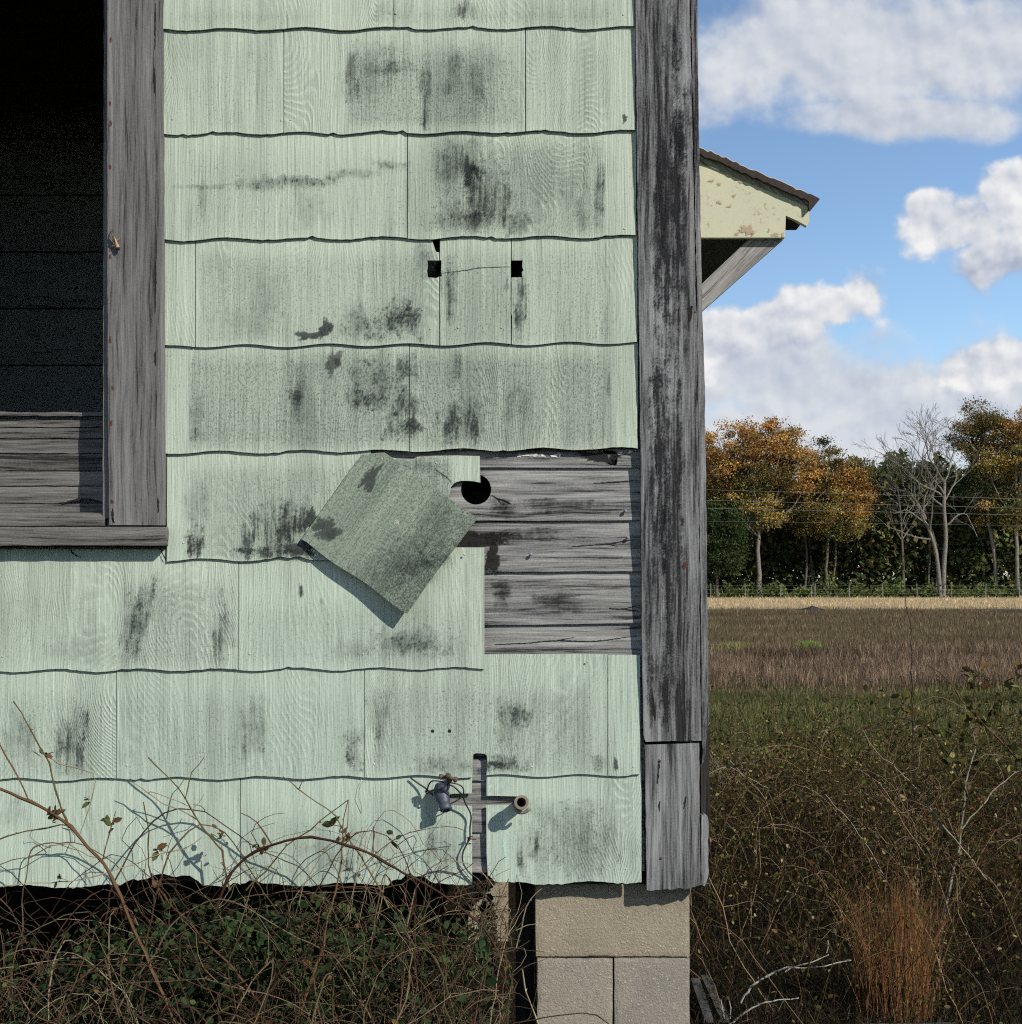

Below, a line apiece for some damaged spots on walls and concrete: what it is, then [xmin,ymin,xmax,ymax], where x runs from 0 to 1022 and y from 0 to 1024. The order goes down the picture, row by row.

mould [439,141,530,228]
mould [355,358,423,440]
mould [437,396,481,443]
mould [234,504,343,558]